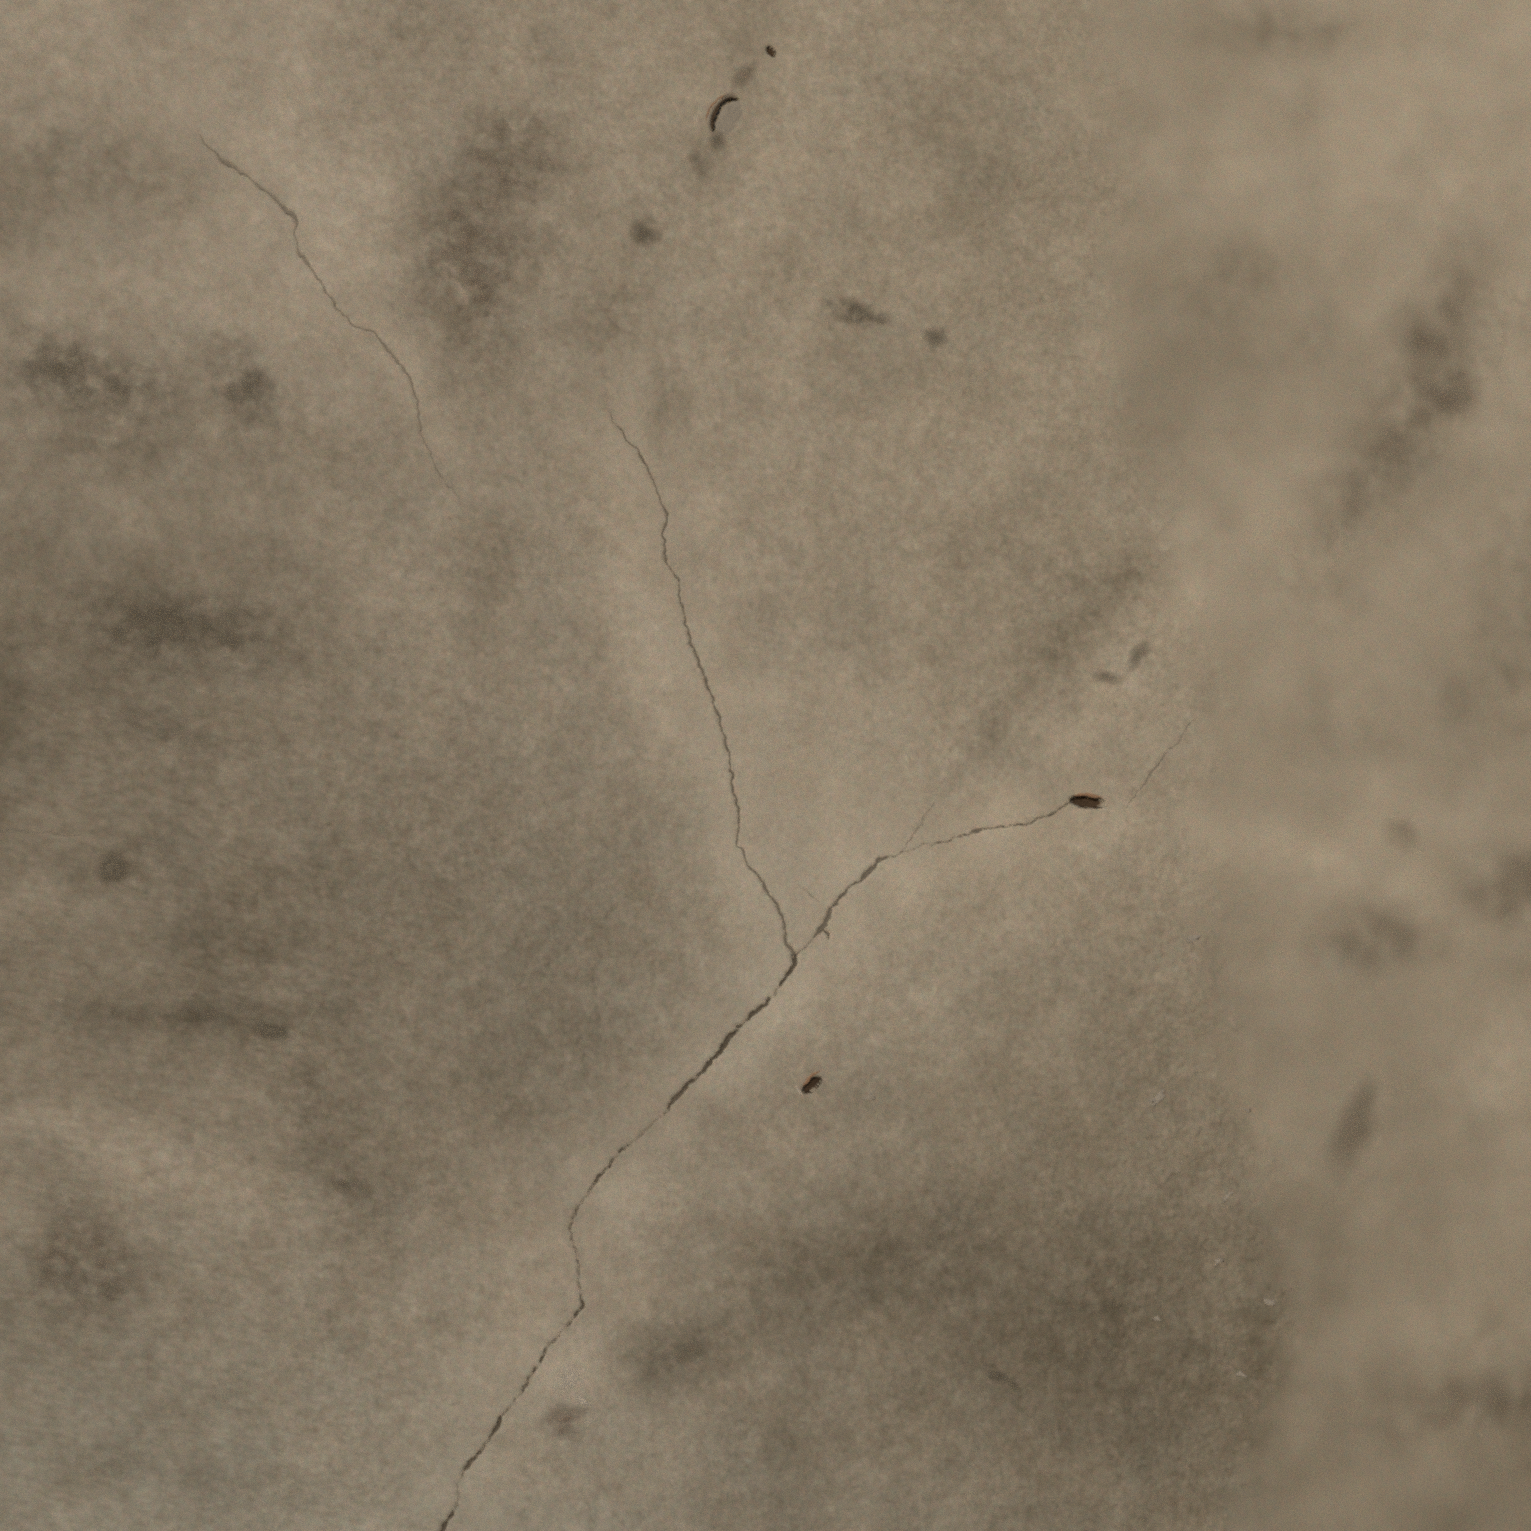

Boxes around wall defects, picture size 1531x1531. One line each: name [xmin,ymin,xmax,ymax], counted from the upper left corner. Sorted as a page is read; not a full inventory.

crack [200,135,459,500]
crack [1128,716,1198,805]
crack [440,411,1072,1531]